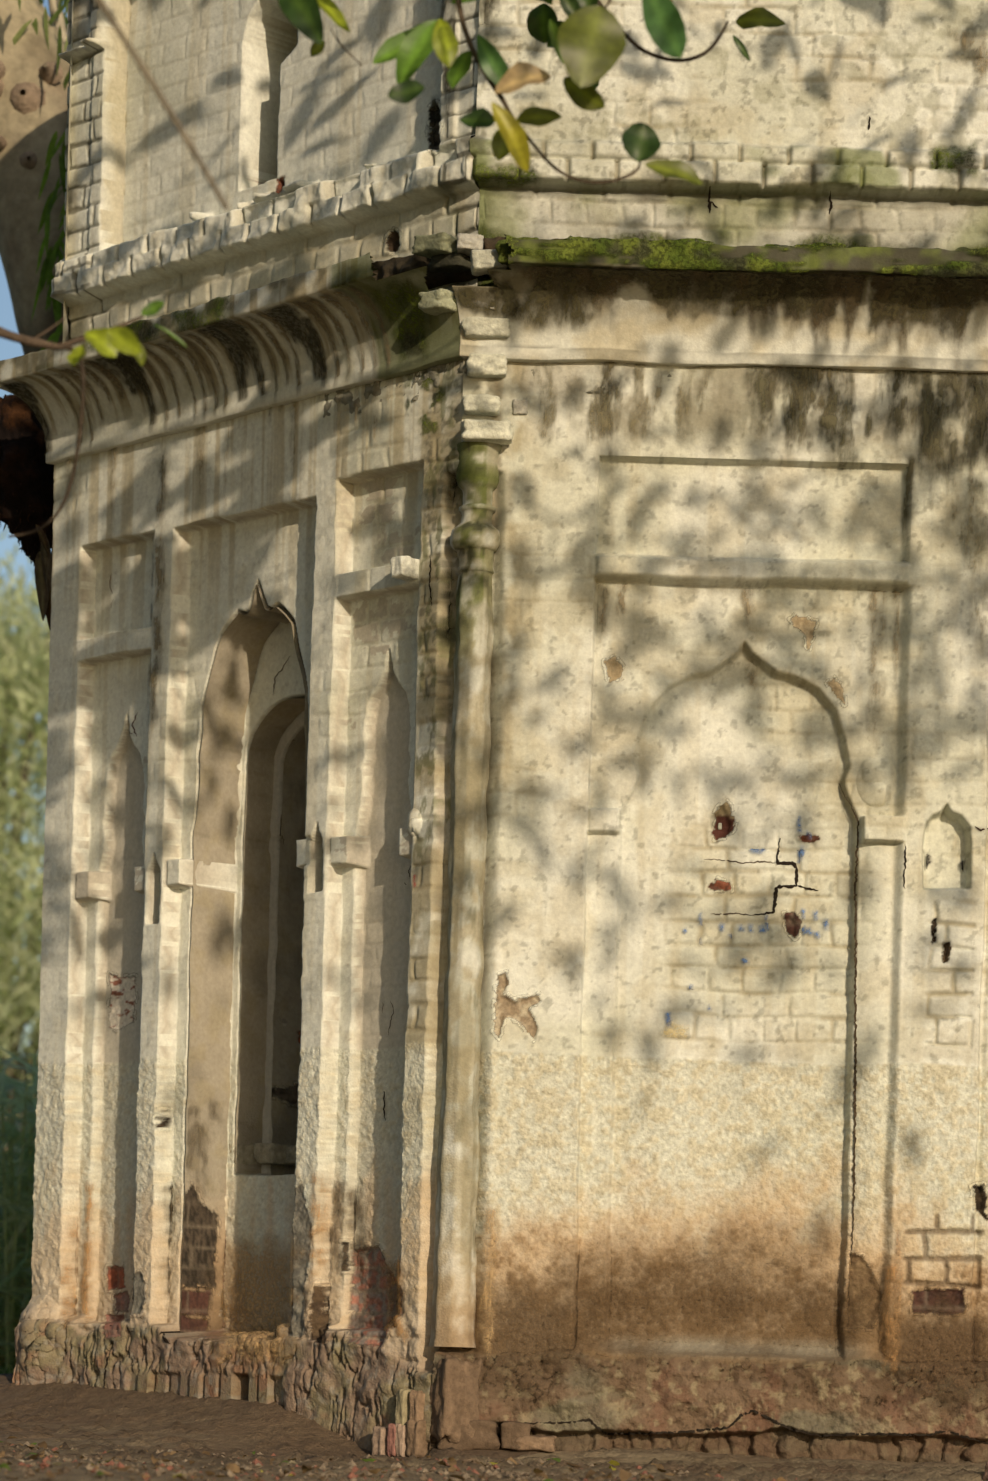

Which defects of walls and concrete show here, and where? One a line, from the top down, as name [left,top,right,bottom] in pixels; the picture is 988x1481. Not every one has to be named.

leakage [452,267,988,346]
leakage [588,362,707,434]
leakage [747,366,988,566]
spalling [712,799,738,842]
crack [709,838,819,916]
spalling [490,969,541,1043]
crack [839,784,859,1264]
spalling [969,1181,988,1220]
spalling [181,1182,230,1345]
spalling [287,1181,405,1348]
leakage [487,1252,863,1395]
crack [496,1410,988,1444]